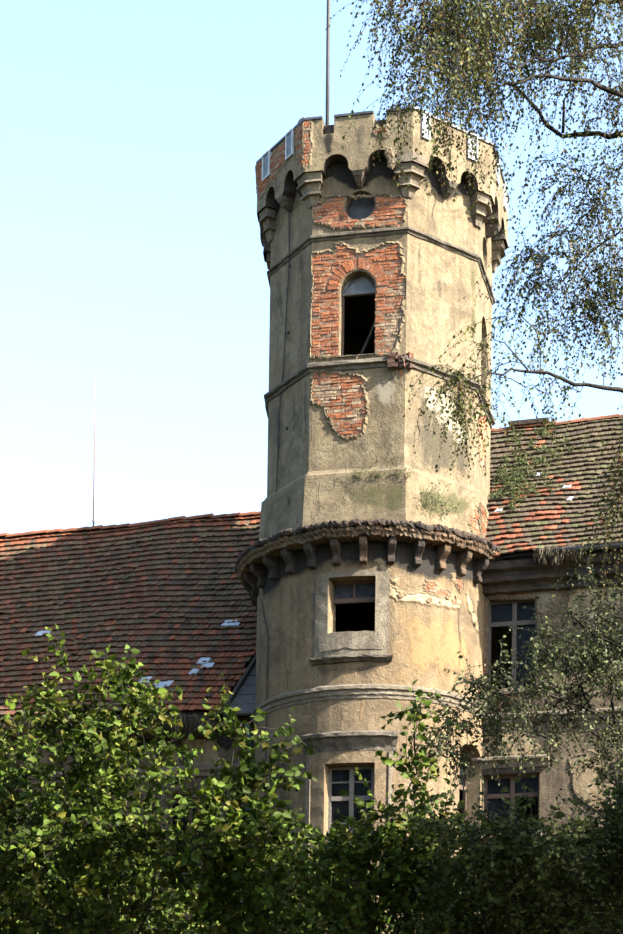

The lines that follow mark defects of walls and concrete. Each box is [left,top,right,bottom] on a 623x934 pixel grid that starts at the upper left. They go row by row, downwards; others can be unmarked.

spalling [255,117,315,200]
spalling [310,193,414,441]
peeling [373,558,623,676]